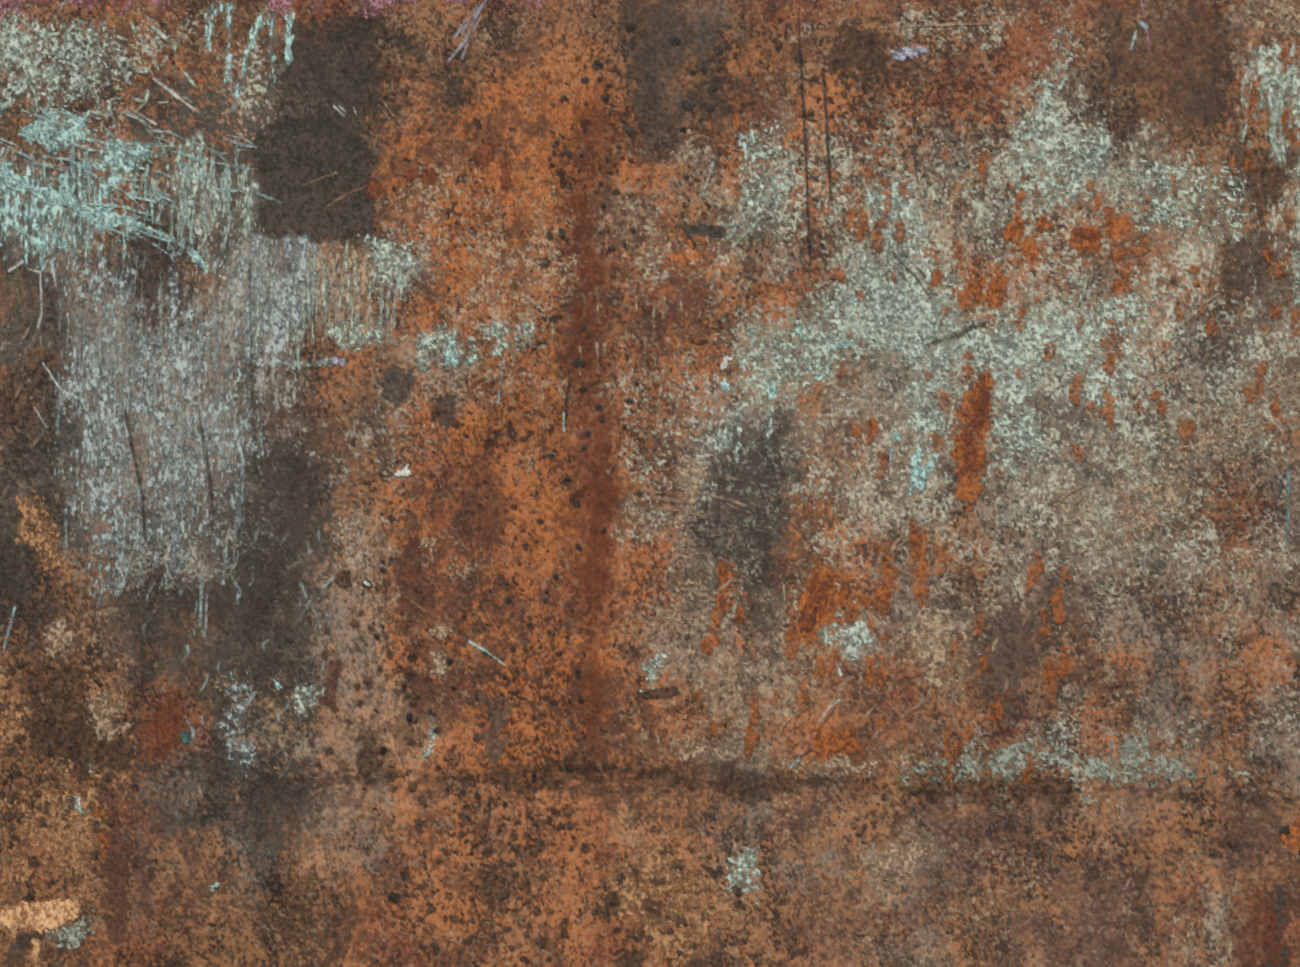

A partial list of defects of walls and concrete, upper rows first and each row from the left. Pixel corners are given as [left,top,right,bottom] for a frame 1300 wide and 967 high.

peeling [722,120,796,232]
rust [852,416,889,478]
peeling [712,168,1152,495]
rust [830,147,1048,331]
rust [926,351,1003,518]
peeling [1008,67,1112,208]
rust [1003,176,1150,428]
peeling [1129,150,1248,256]
rust [1243,357,1285,432]
peeling [1241,0,1300,156]
rust [784,519,951,694]
spalling [349,610,455,863]